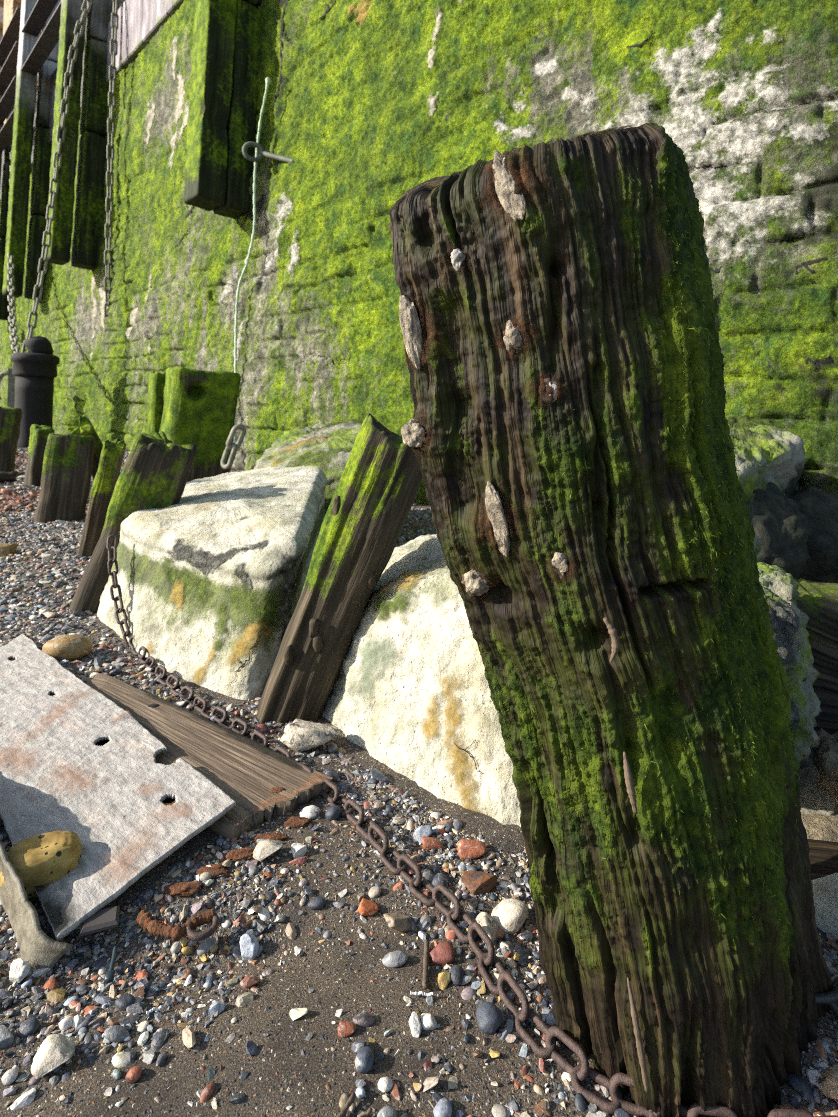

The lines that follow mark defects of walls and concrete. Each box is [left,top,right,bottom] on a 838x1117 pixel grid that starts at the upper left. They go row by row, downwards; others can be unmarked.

water stain [801,127,838,242]
rust [170,582,183,607]
rust [229,623,272,664]
rust [194,644,215,685]
rust [422,678,476,811]